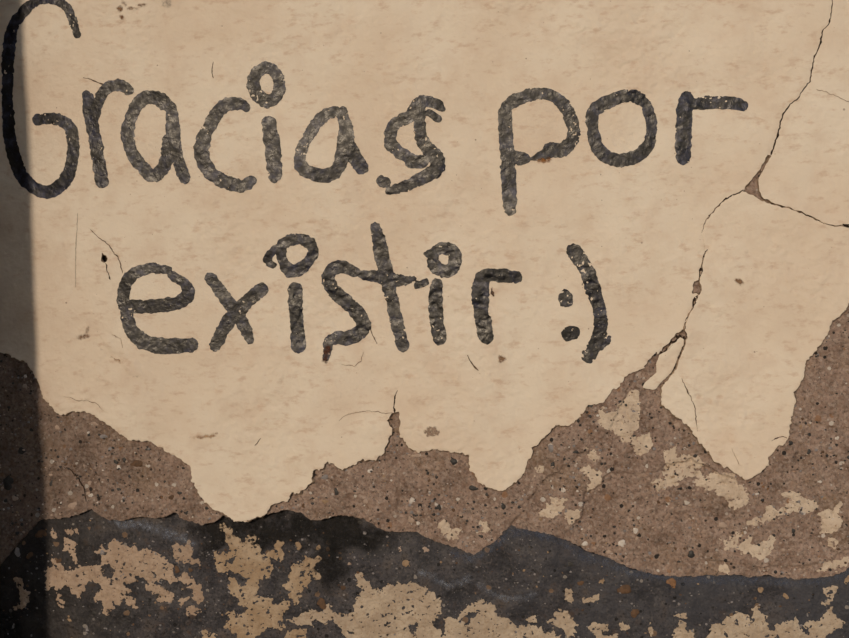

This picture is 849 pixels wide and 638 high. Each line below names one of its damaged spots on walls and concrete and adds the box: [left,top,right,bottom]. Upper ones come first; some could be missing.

crack [771,0,849,155]
spalling [0,352,630,638]
spalling [267,163,849,638]
crack [660,190,744,425]